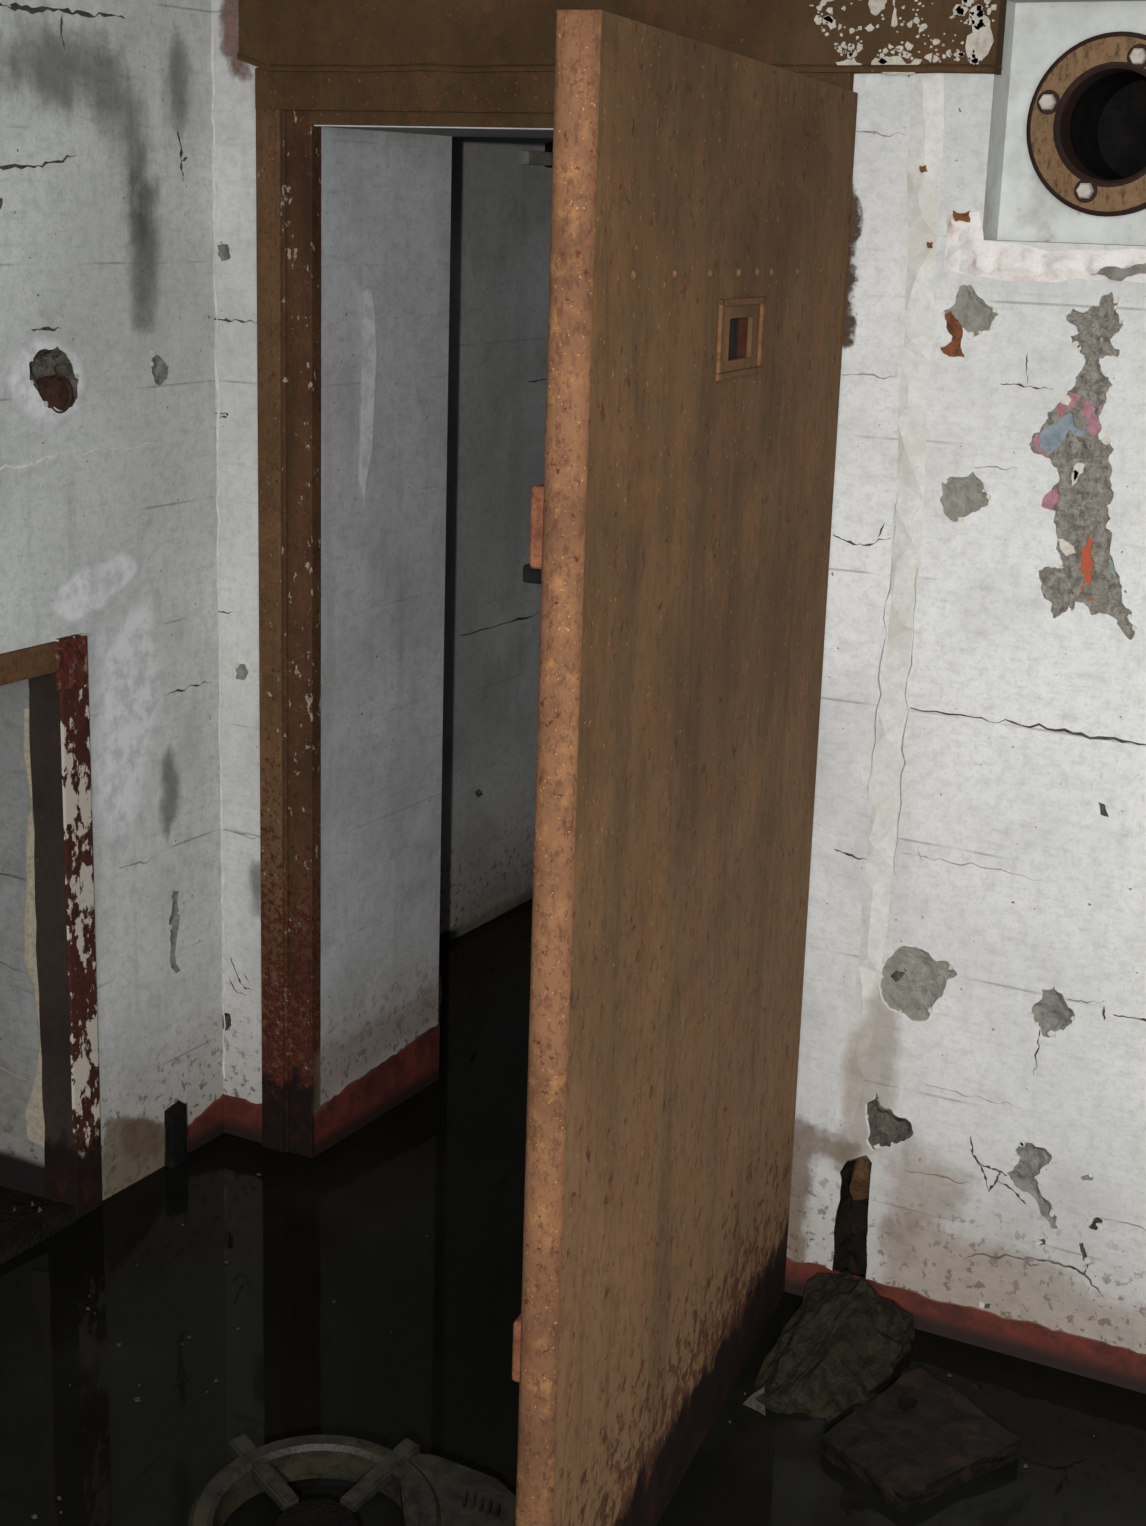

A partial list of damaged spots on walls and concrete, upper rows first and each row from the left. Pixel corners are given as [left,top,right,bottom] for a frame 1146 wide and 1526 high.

peeling [810,0,997,76]
spalling [940,285,999,357]
spalling [940,472,991,522]
peeling [1029,292,1137,640]
spalling [876,946,958,1021]
spalling [1029,986,1106,1074]
spalling [865,1093,913,1150]
spalling [970,1137,1058,1245]